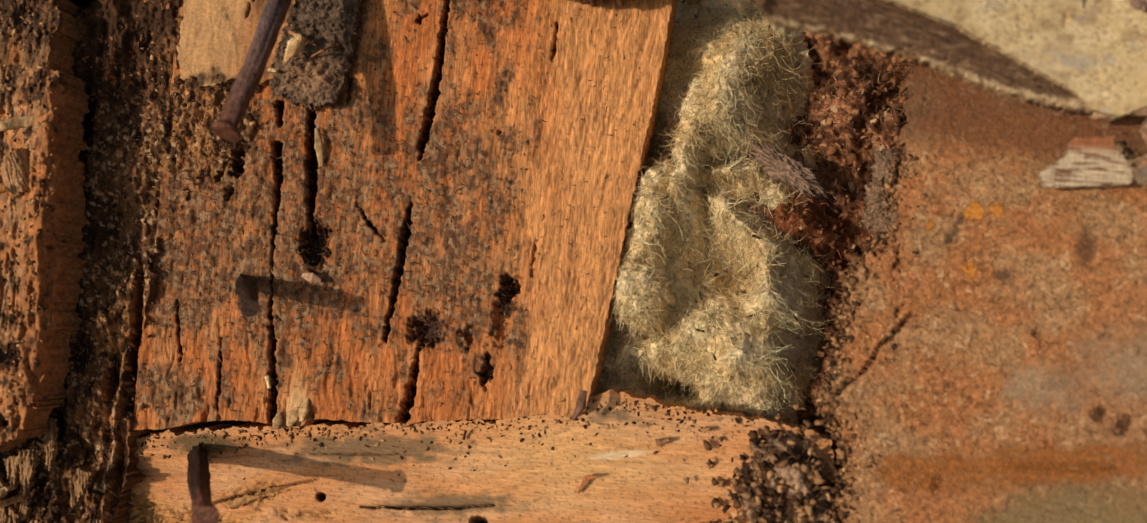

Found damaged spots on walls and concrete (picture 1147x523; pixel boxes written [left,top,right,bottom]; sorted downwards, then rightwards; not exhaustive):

crack [421,0,450,159]
peeling [1129,107,1147,187]
corrosion [963,201,1003,220]
crack [359,207,413,341]
crack [270,309,279,430]
crack [401,349,421,428]